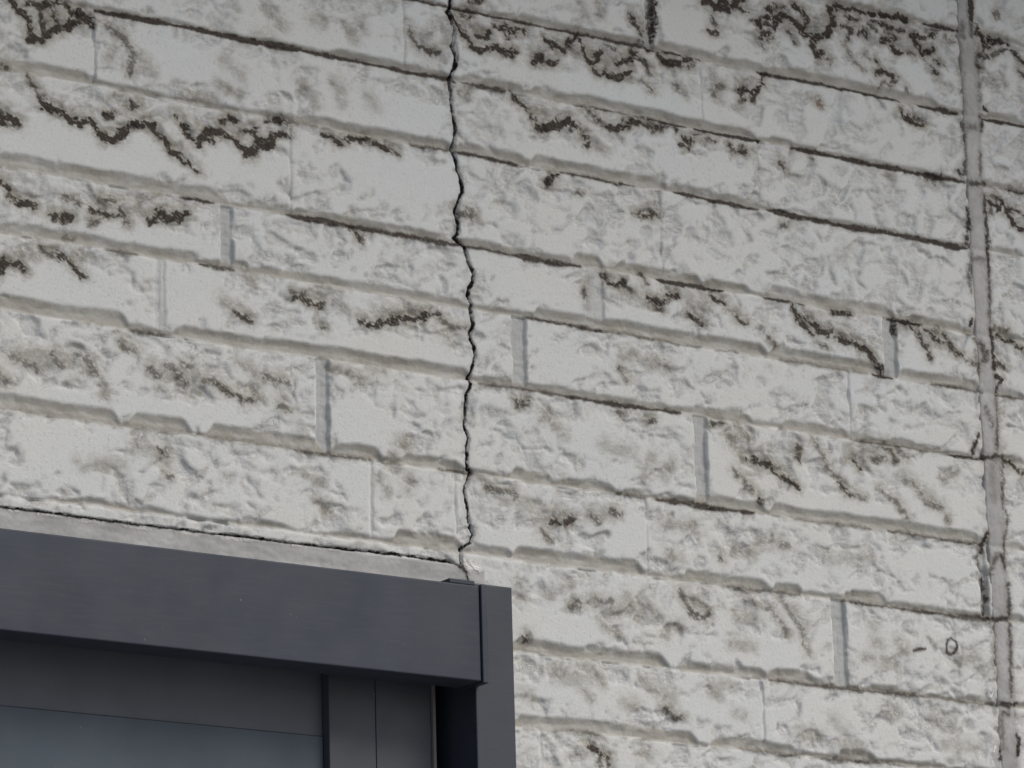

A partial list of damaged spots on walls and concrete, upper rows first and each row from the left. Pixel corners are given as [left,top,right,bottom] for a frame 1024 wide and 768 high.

damp [409,0,650,82]
damp [738,2,831,65]
damp [839,15,958,76]
damp [174,114,291,158]
damp [411,145,518,167]
damp [637,116,760,151]
damp [899,105,958,123]
damp [48,194,129,226]
damp [146,197,214,227]
crack [0,0,476,580]
damp [599,272,749,325]
damp [763,297,867,351]